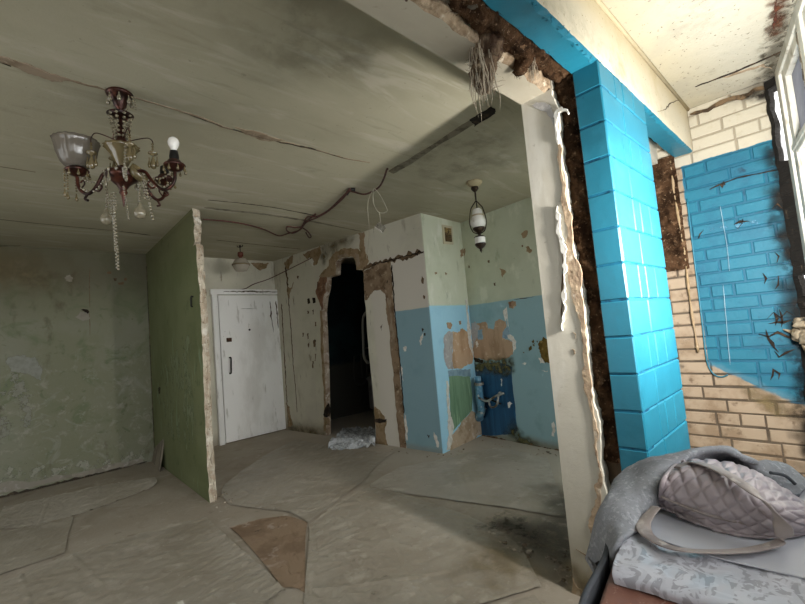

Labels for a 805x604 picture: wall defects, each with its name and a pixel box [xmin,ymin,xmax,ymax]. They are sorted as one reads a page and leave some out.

corrosion [770,0,786,36]
crack [0,56,105,90]
crack [134,97,370,163]
flaking render [302,232,369,431]
spalling [532,102,603,533]
peeling [427,299,517,451]
flaking render [374,407,388,445]